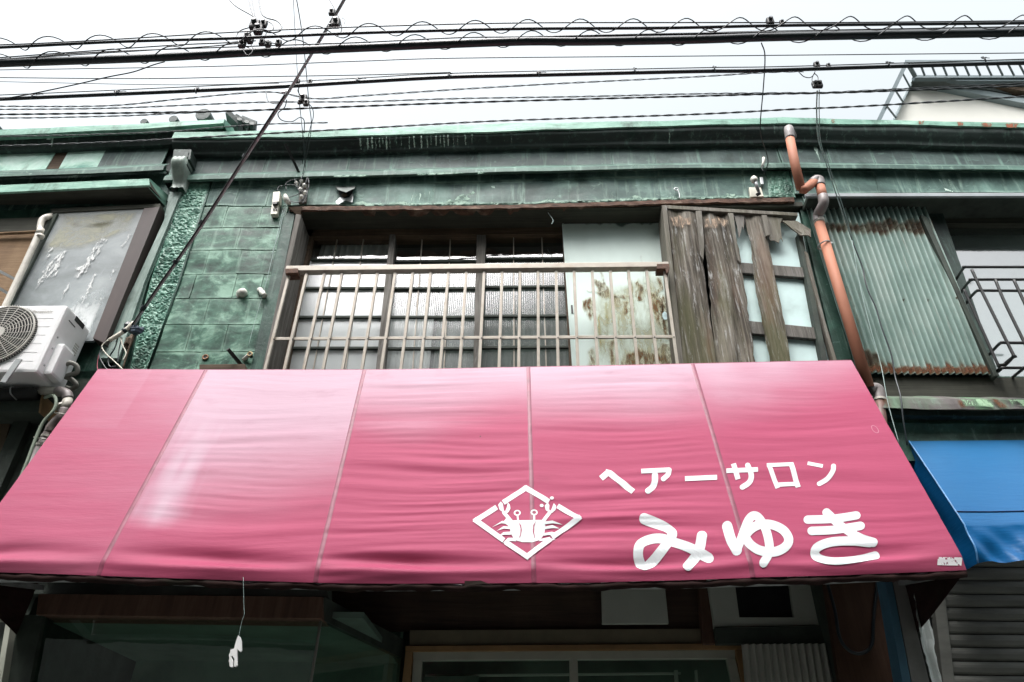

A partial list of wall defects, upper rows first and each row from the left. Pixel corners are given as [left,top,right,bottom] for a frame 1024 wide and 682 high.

corrosion [825,217,926,235]
peeling [38,247,66,286]
peeling [63,239,107,332]
corrosion [583,273,671,365]
corrosion [863,349,990,374]